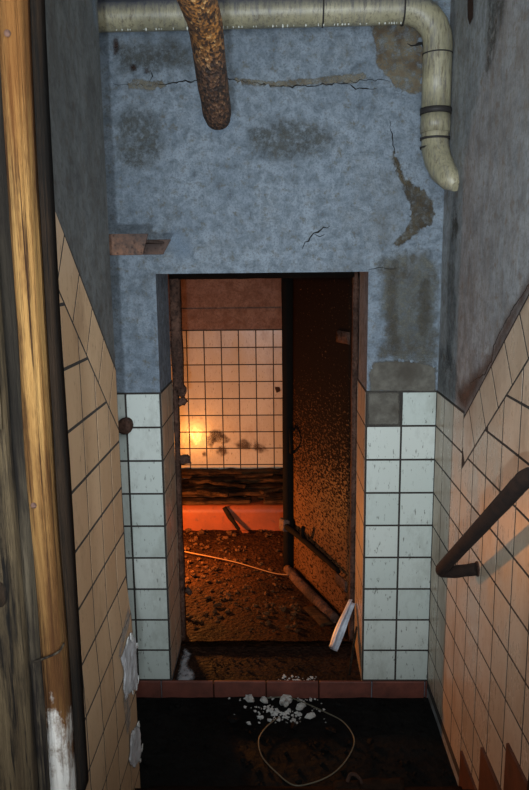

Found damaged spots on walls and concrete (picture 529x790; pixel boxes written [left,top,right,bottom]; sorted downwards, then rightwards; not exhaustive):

crack [115,70,197,86]
crack [228,78,390,90]
flaking render [234,25,423,95]
peeling [390,122,435,247]
crack [302,227,328,249]
damp [378,252,439,364]
spalling [119,612,143,767]